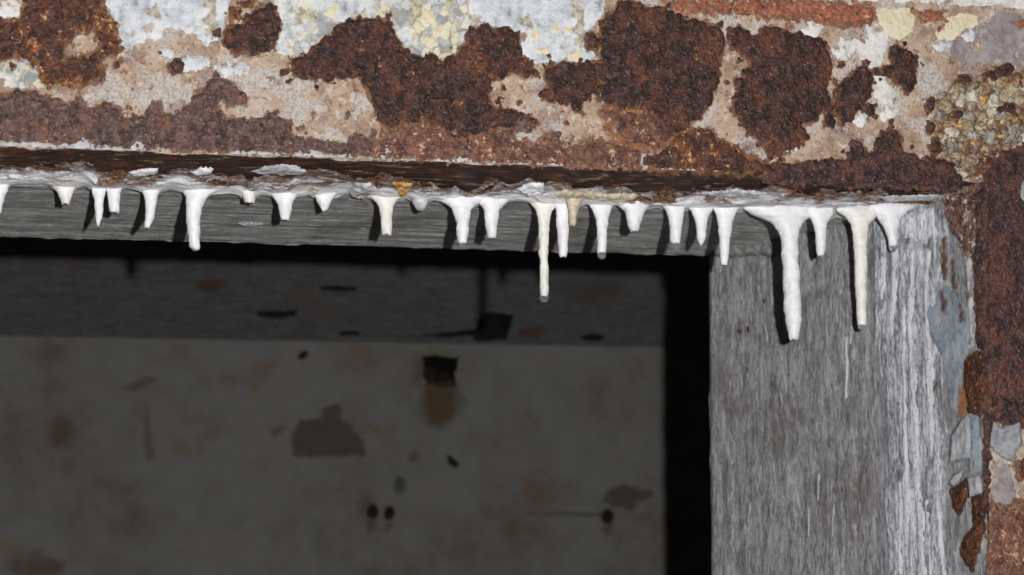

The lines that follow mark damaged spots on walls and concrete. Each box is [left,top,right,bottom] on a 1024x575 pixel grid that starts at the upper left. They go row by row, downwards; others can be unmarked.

corrosion [0,0,919,179]
corrosion [911,0,949,34]
hole [422,355,459,389]
leakage [0,138,962,575]
corrosion [762,62,1024,575]
peeling [927,257,1023,507]